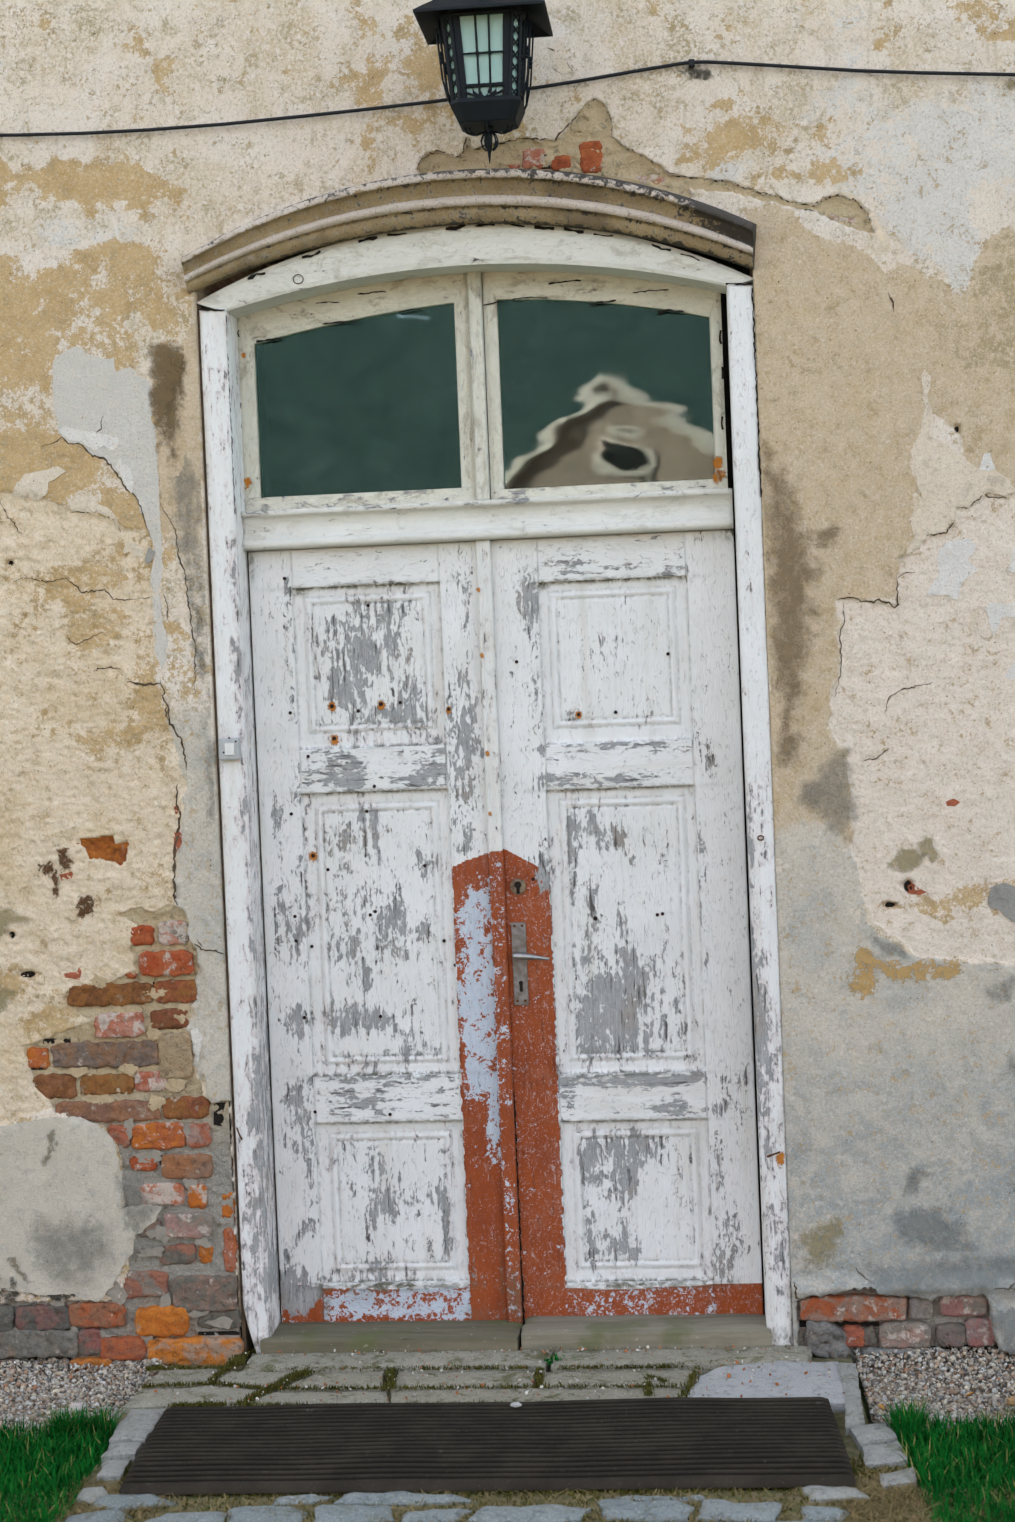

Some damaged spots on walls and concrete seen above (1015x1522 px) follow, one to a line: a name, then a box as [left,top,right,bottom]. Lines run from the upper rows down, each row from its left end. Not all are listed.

spalling [417,99,693,198]
spalling [810,191,889,241]
peeling [12,466,67,501]
peeling [52,346,168,669]
peeling [902,370,1015,600]
crack [927,494,1006,536]
crack [14,416,197,904]
crack [835,572,915,696]
spalling [76,836,129,865]
spalling [885,880,926,907]
spalling [0,903,244,1373]
spalling [797,1288,1015,1364]